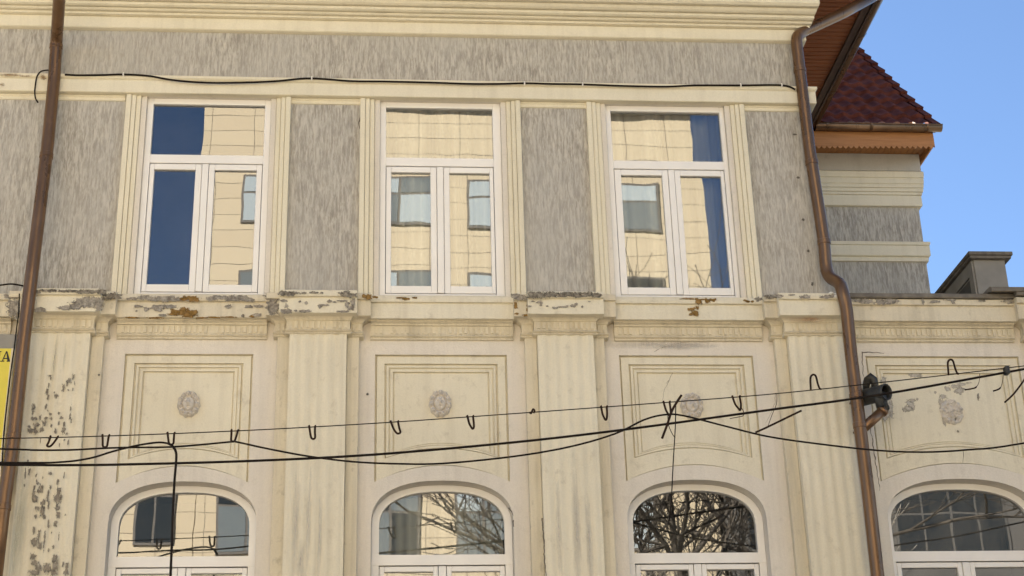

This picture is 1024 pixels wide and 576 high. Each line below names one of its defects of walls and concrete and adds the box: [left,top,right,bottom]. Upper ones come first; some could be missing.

peeling [34,288,189,319]
rust [165,295,200,318]
peeling [196,290,378,319]
spalling [511,291,603,309]
rust [681,298,716,317]
peeling [27,375,75,447]
spalling [934,382,971,432]
peeling [24,460,69,576]